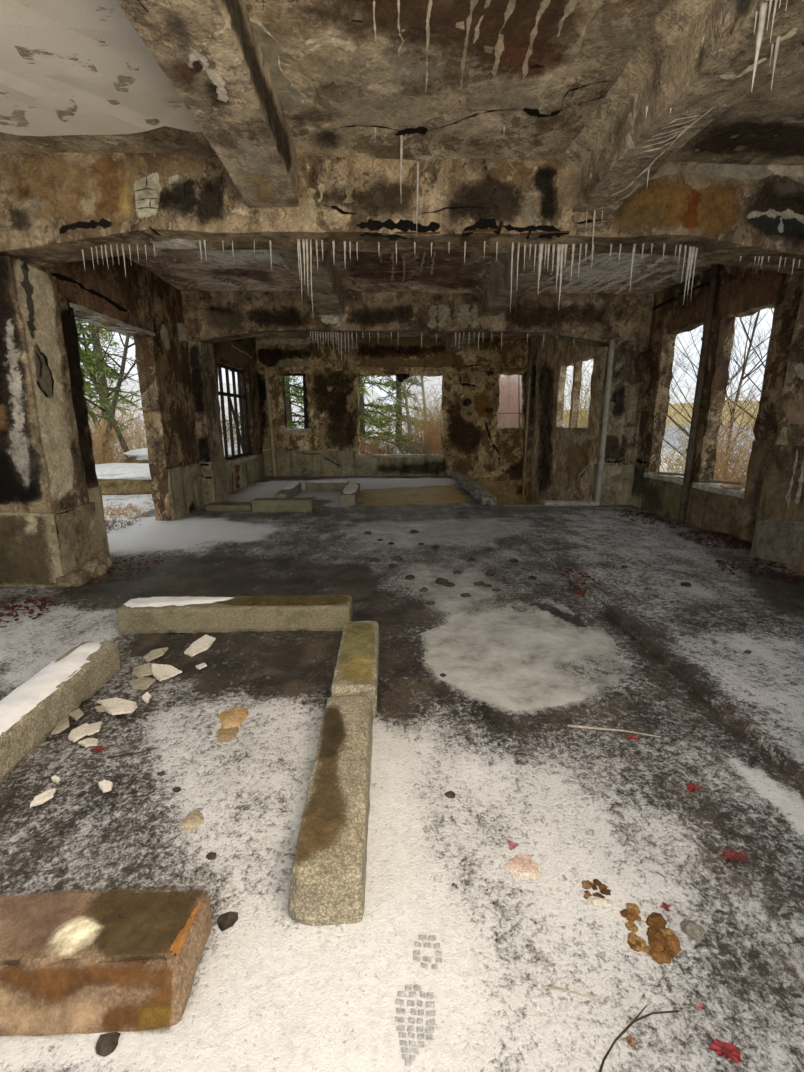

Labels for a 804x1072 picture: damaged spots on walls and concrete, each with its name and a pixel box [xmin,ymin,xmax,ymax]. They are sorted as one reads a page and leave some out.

peeling [0,92,35,127]
peeling [15,46,97,73]
peeling [56,96,77,122]
peeling [107,64,139,105]
leakage [460,0,491,87]
crack [340,81,612,136]
leakage [492,0,516,77]
leakage [522,0,550,79]
crack [59,218,112,234]
corrosion [618,177,737,233]
leakage [150,239,299,292]
leakage [0,254,51,584]